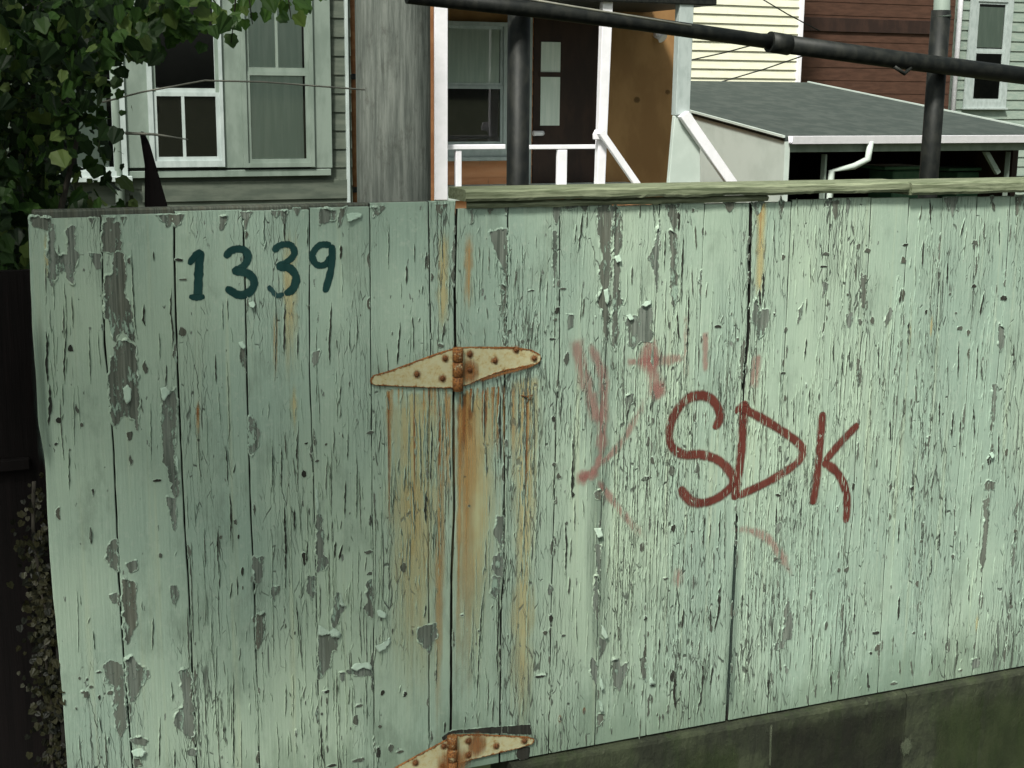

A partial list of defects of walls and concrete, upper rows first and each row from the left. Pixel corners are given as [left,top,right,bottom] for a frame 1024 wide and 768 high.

peeling [28,214,149,441]
peeling [469,207,524,344]
peeling [551,203,680,353]
peeling [152,386,181,532]
corrosion [387,346,537,660]
peeling [75,538,151,767]
peeling [173,666,198,757]
peeling [316,591,374,694]
peeling [416,622,439,654]
corrosion [440,733,499,768]